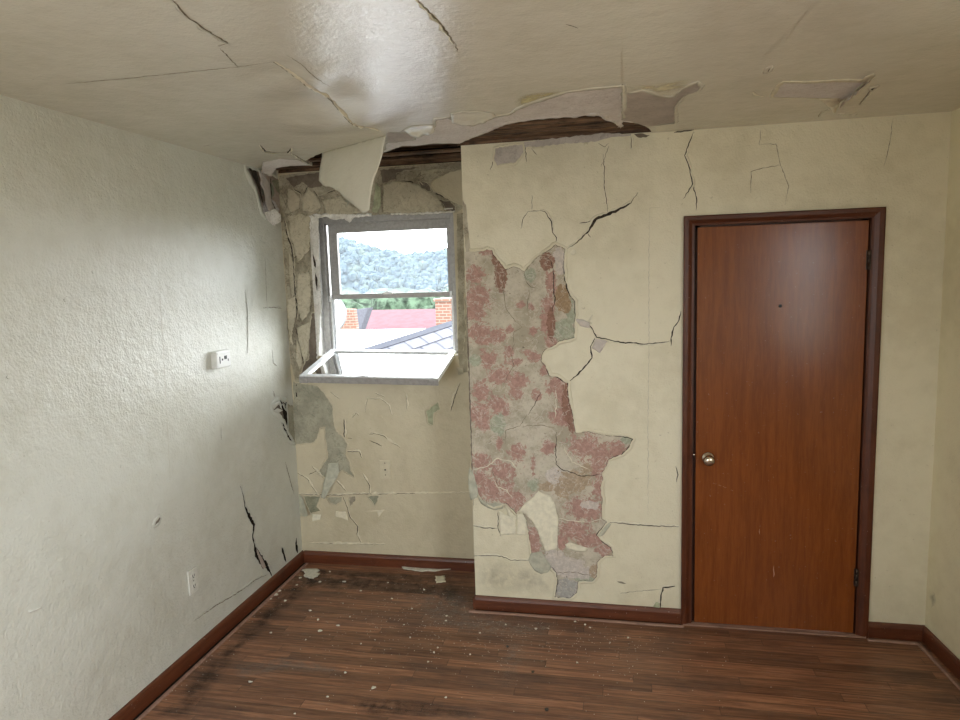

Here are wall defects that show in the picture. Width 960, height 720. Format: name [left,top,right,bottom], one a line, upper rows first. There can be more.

crack [67,0,381,132]
crack [416,0,458,52]
peeling [770,73,880,113]
crack [674,130,697,209]
crack [750,131,789,196]
crack [522,43,681,498]
peeling [244,81,705,601]
crack [194,412,469,620]